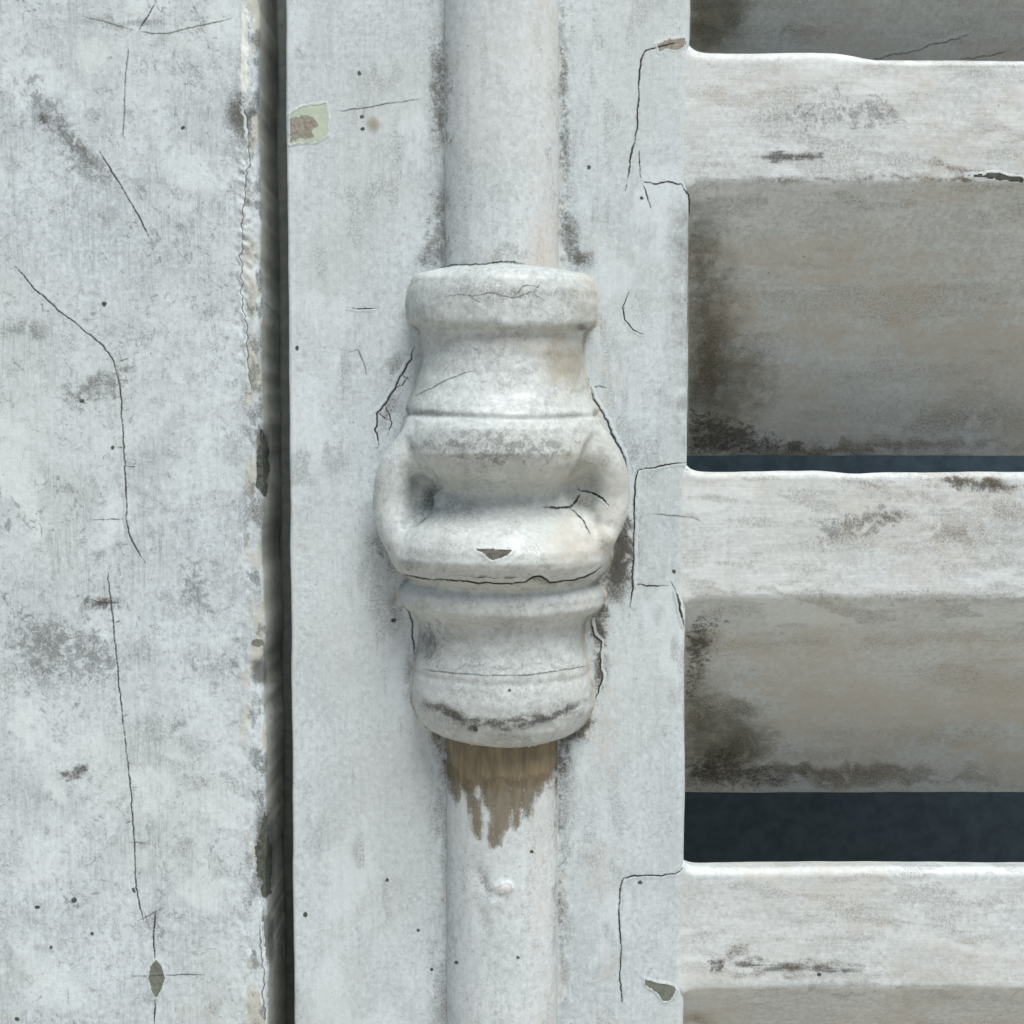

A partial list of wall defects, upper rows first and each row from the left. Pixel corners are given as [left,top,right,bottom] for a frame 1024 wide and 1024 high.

peeling [287,101,331,148]
crack [626,43,690,214]
crack [10,265,146,567]
water stain [689,411,801,454]
peeling [468,544,517,565]
crack [545,378,693,629]
water stain [686,617,726,697]
crack [91,570,196,976]
corrosion [447,738,557,848]
peeling [145,957,167,1000]
crack [618,867,686,1004]
peeling [641,975,679,1005]